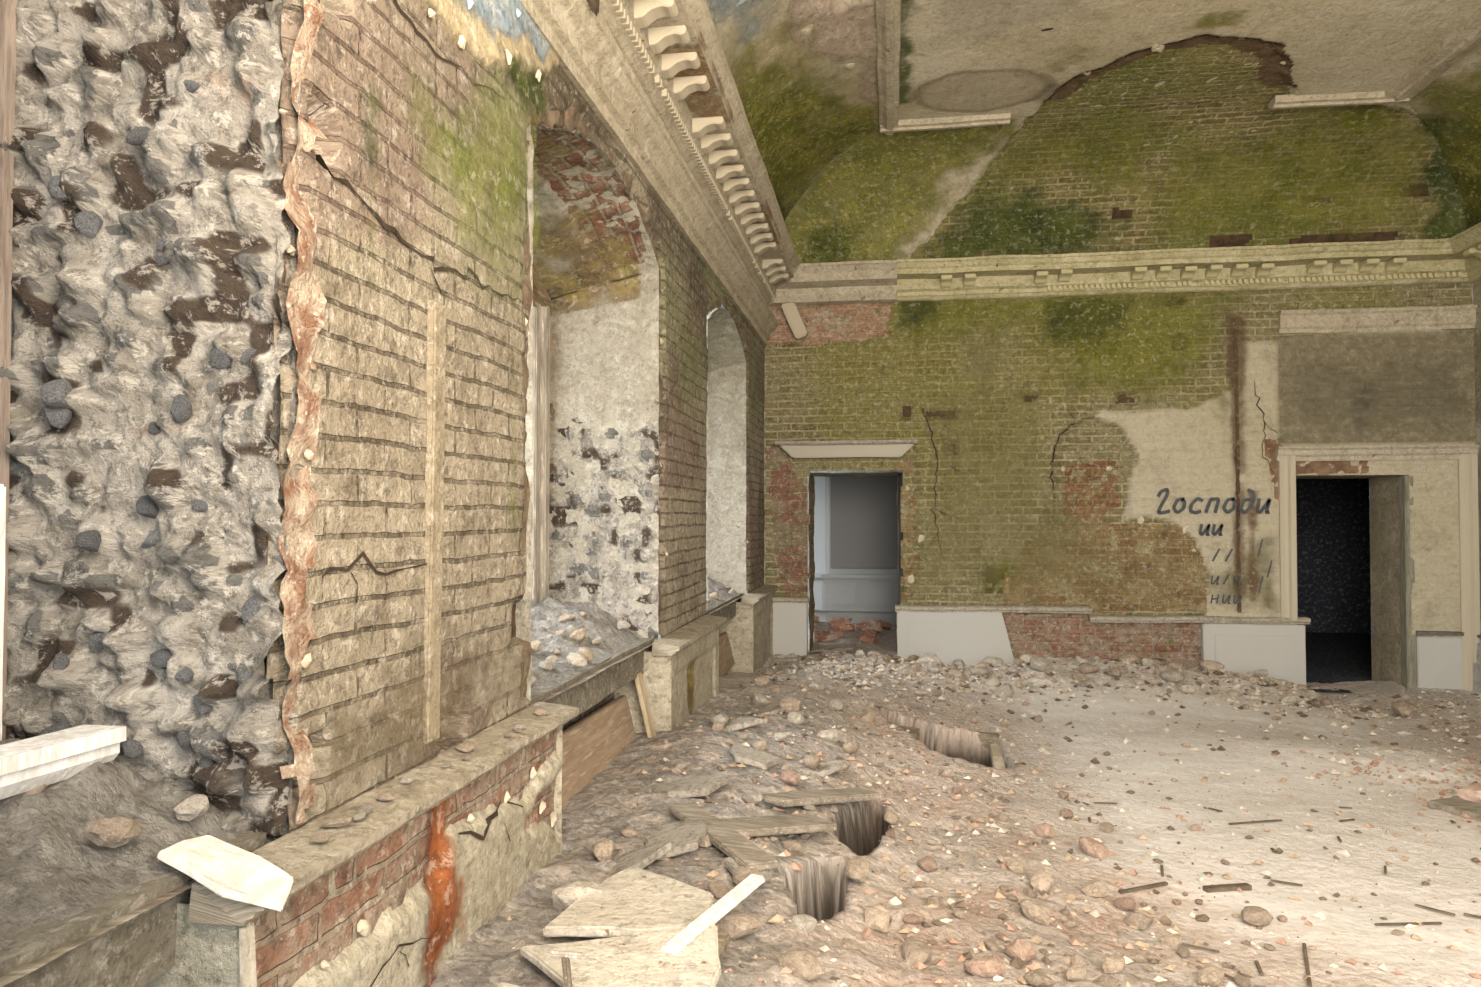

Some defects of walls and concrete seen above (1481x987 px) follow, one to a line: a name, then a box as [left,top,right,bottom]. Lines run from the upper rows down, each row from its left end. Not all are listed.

crack [394,0,504,99]
peeling [423,0,559,82]
crack [316,154,523,303]
water stain [735,50,1015,264]
flaking render [909,34,1443,259]
spalling [0,0,328,845]
crack [322,551,427,603]
spalling [511,594,532,697]
spalling [520,461,530,557]
flaking render [985,459,1207,670]
flaking render [250,728,557,987]
crack [370,938,428,987]